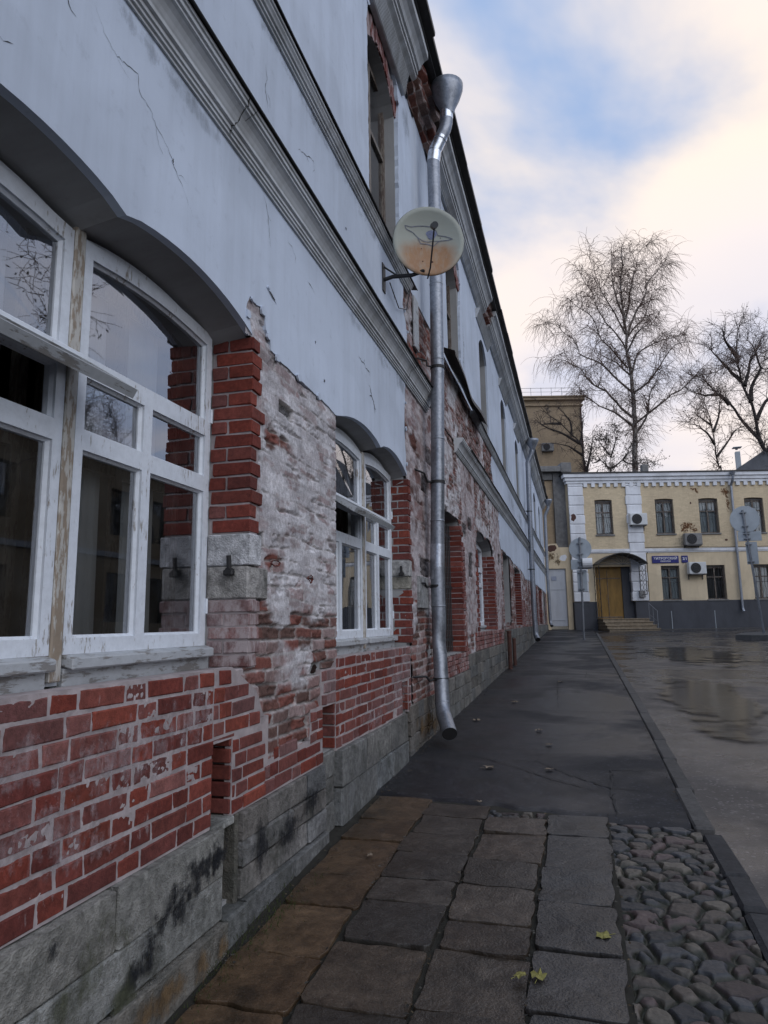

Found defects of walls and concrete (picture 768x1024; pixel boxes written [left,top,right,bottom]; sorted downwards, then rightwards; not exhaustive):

crack [230,81,269,134]
peeling [403,289,431,382]
peeling [241,286,337,759]
peeling [404,385,435,704]
peeling [444,361,548,674]
water stain [252,789,319,873]
water stain [113,843,226,1015]